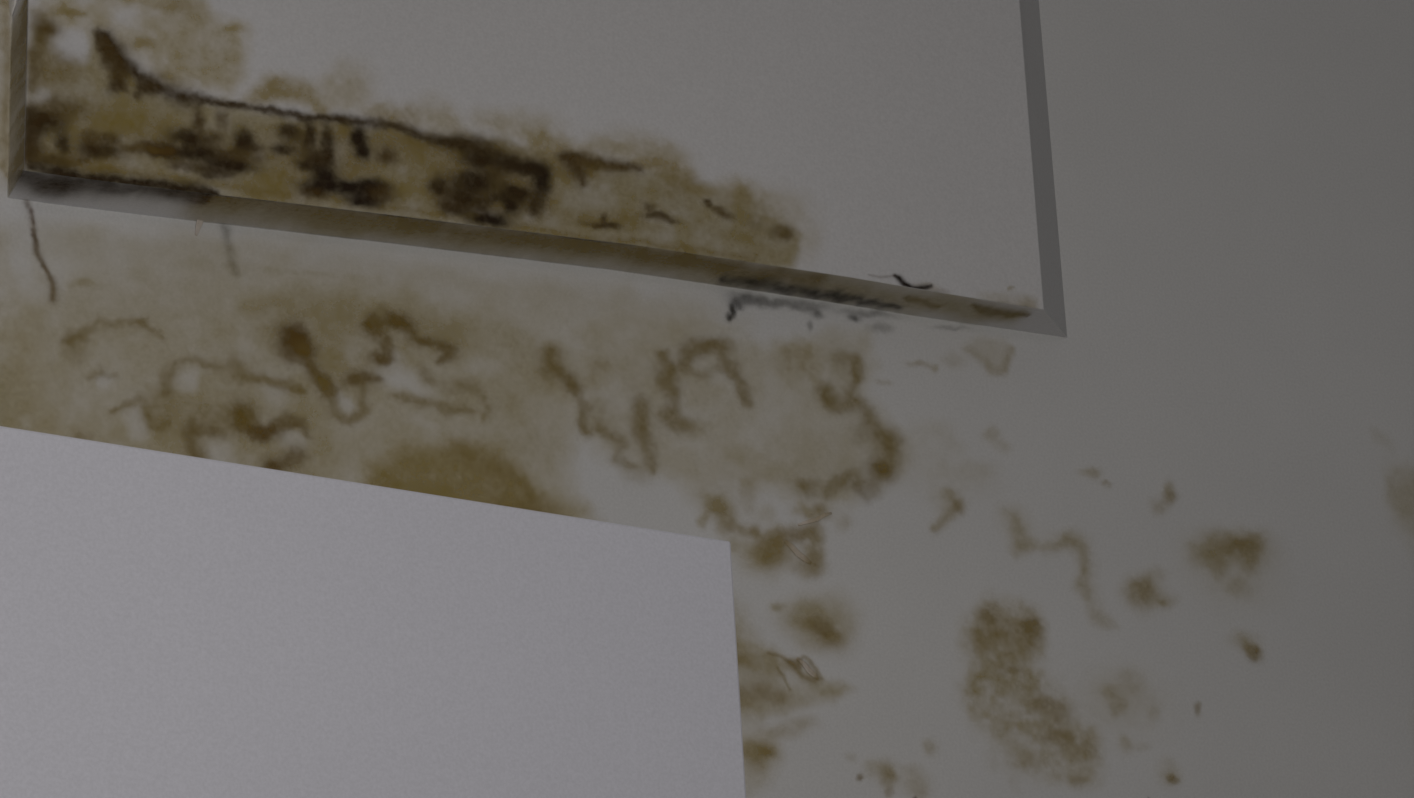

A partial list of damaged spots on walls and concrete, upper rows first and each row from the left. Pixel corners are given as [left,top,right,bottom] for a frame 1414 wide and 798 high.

leakage [9,0,791,263]
leakage [147,297,468,475]
leakage [776,287,898,308]
leakage [371,448,532,510]